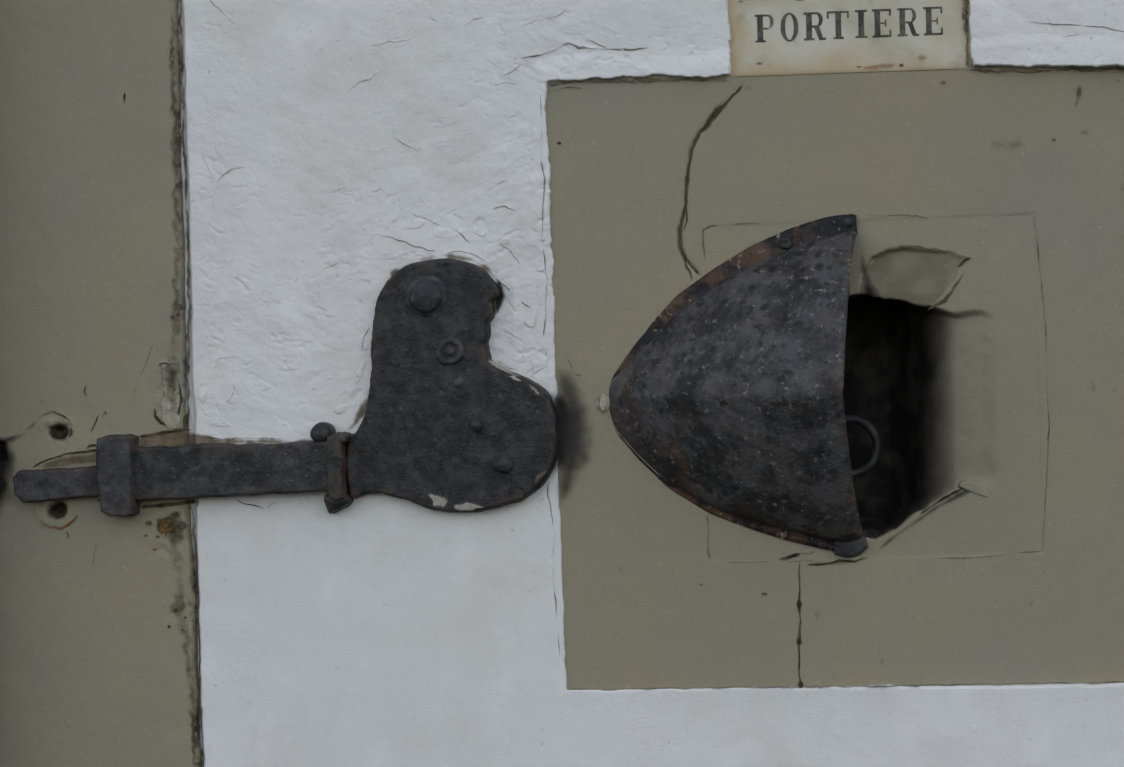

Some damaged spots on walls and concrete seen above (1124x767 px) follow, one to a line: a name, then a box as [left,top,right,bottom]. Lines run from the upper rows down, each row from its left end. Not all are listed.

crack [963,0,1124,73]
crack [540,43,706,106]
crack [678,86,749,279]
spalling [860,246,970,310]
crack [755,563,982,688]